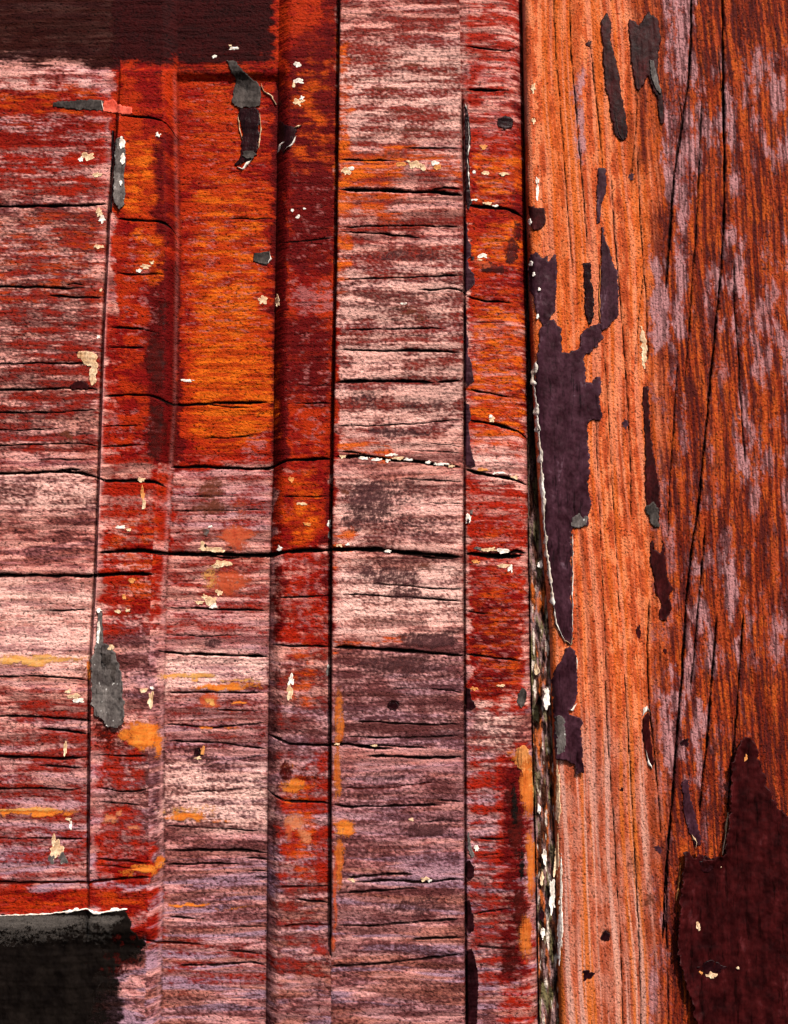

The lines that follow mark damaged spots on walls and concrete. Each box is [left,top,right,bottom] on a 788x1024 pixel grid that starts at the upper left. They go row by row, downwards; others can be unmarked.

peeling [103,99,133,115]
peeling [212,45,276,170]
peeling [601,13,628,141]
peeling [628,12,665,124]
peeling [92,136,126,210]
crack [0,547,525,578]
crack [0,362,528,511]
peeling [527,168,619,774]
crack [553,0,746,1024]
peeling [65,578,135,728]
peeling [676,737,788,1024]
peeling [0,908,148,1024]